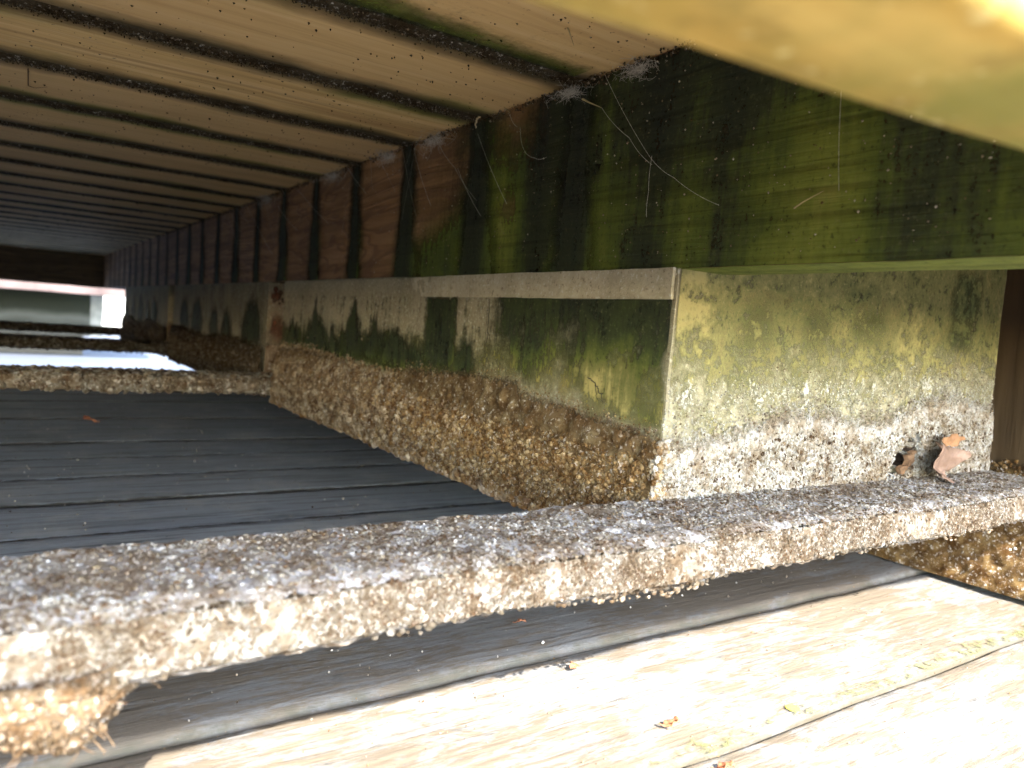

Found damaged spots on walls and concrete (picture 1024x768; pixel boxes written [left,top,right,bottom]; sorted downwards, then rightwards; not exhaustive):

damp [454,118,495,275]
damp [545,80,596,271]
damp [285,297,475,375]
damp [948,272,984,353]
damp [668,365,993,423]